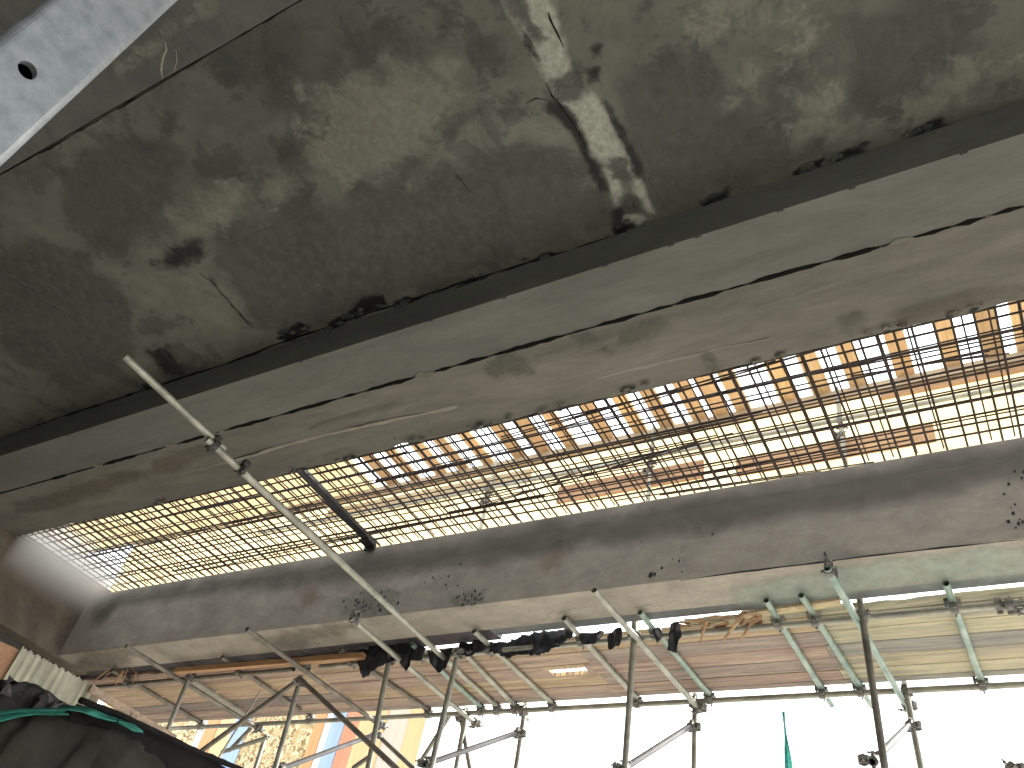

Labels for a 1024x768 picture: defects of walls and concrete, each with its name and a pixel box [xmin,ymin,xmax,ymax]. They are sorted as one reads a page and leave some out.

leakage [206,0,810,322]
spalling [793,141,872,176]
spalling [277,322,310,341]
spalling [325,295,418,330]
spalling [863,322,908,336]
spalling [946,303,984,318]
crack [0,206,1023,494]